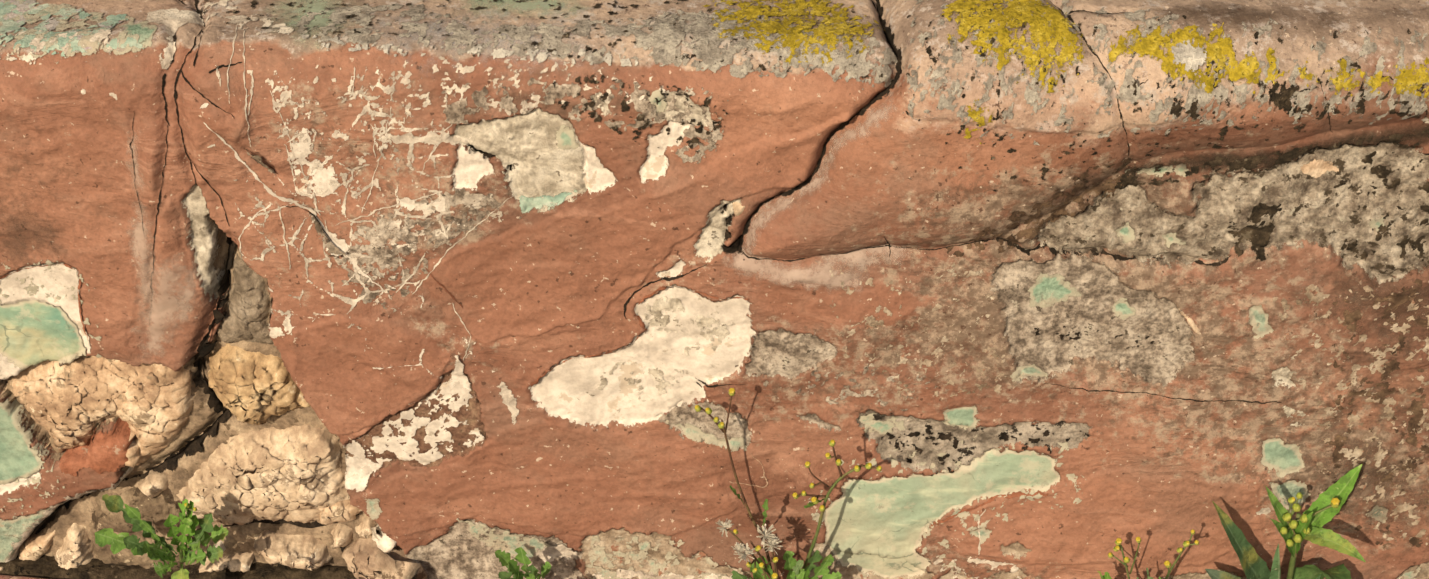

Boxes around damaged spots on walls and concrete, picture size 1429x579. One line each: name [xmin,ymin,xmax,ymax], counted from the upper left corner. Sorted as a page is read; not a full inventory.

peeling [0,0,157,65]
crack [122,0,514,481]
spalling [0,184,751,579]
peeling [265,56,729,316]
crack [624,264,707,318]
spalling [497,142,1429,579]
crack [741,0,1231,266]
crack [30,493,90,538]
crack [223,514,359,553]